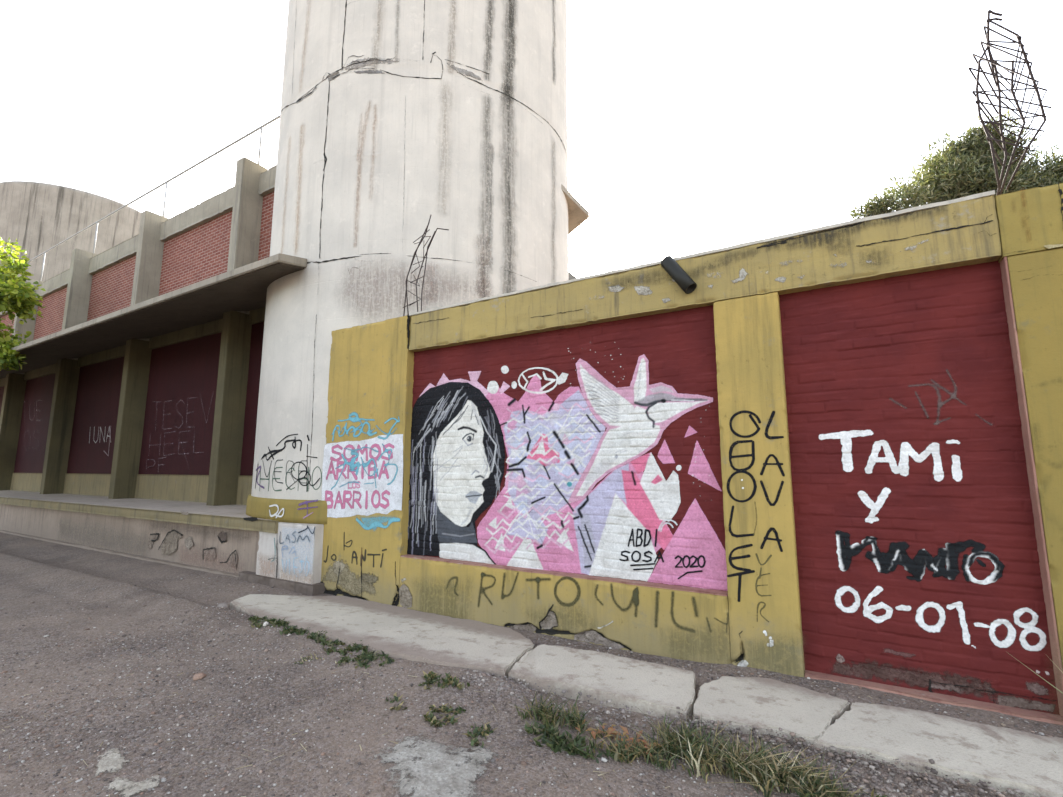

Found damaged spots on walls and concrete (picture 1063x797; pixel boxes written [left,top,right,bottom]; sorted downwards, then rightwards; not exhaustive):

crack [281,0,566,229]
leakage [505,0,514,293]
crack [307,253,471,270]
peeling [593,285,670,303]
peeling [707,269,748,288]
spalling [322,560,378,596]
crack [504,604,631,651]